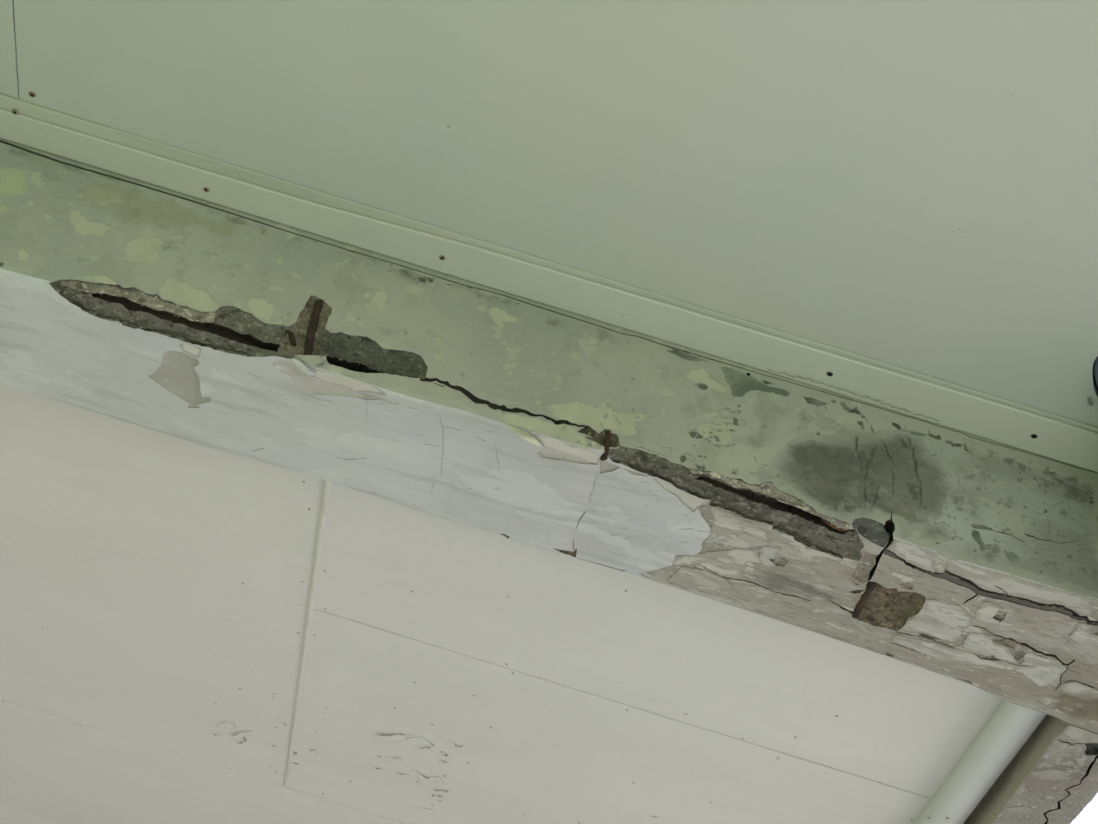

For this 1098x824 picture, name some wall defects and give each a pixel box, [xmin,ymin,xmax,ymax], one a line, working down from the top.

spalling [49,279,428,408]
damp [666,347,790,400]
crack [365,377,588,492]
crack [573,476,597,550]
damp [749,396,973,544]
crack [701,565,852,614]
peeling [501,400,1098,756]
crack [868,511,1098,691]
crack [1043,755,1098,824]